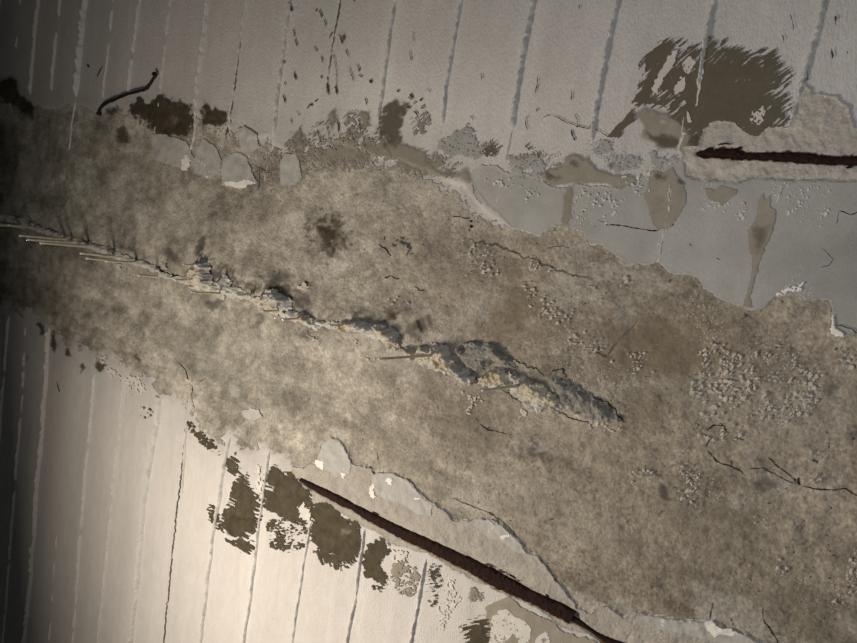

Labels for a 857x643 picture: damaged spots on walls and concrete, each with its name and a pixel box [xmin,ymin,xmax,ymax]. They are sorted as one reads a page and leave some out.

damp [0,79,33,117]
damp [636,108,697,150]
peeling [631,36,857,183]
rust [697,146,857,169]
crack [453,185,585,278]
crack [511,358,567,378]
crack [502,390,594,427]
crack [705,423,857,496]
peeling [207,452,314,555]
peeling [309,502,361,570]
peeling [362,537,390,586]
rust [299,478,625,643]